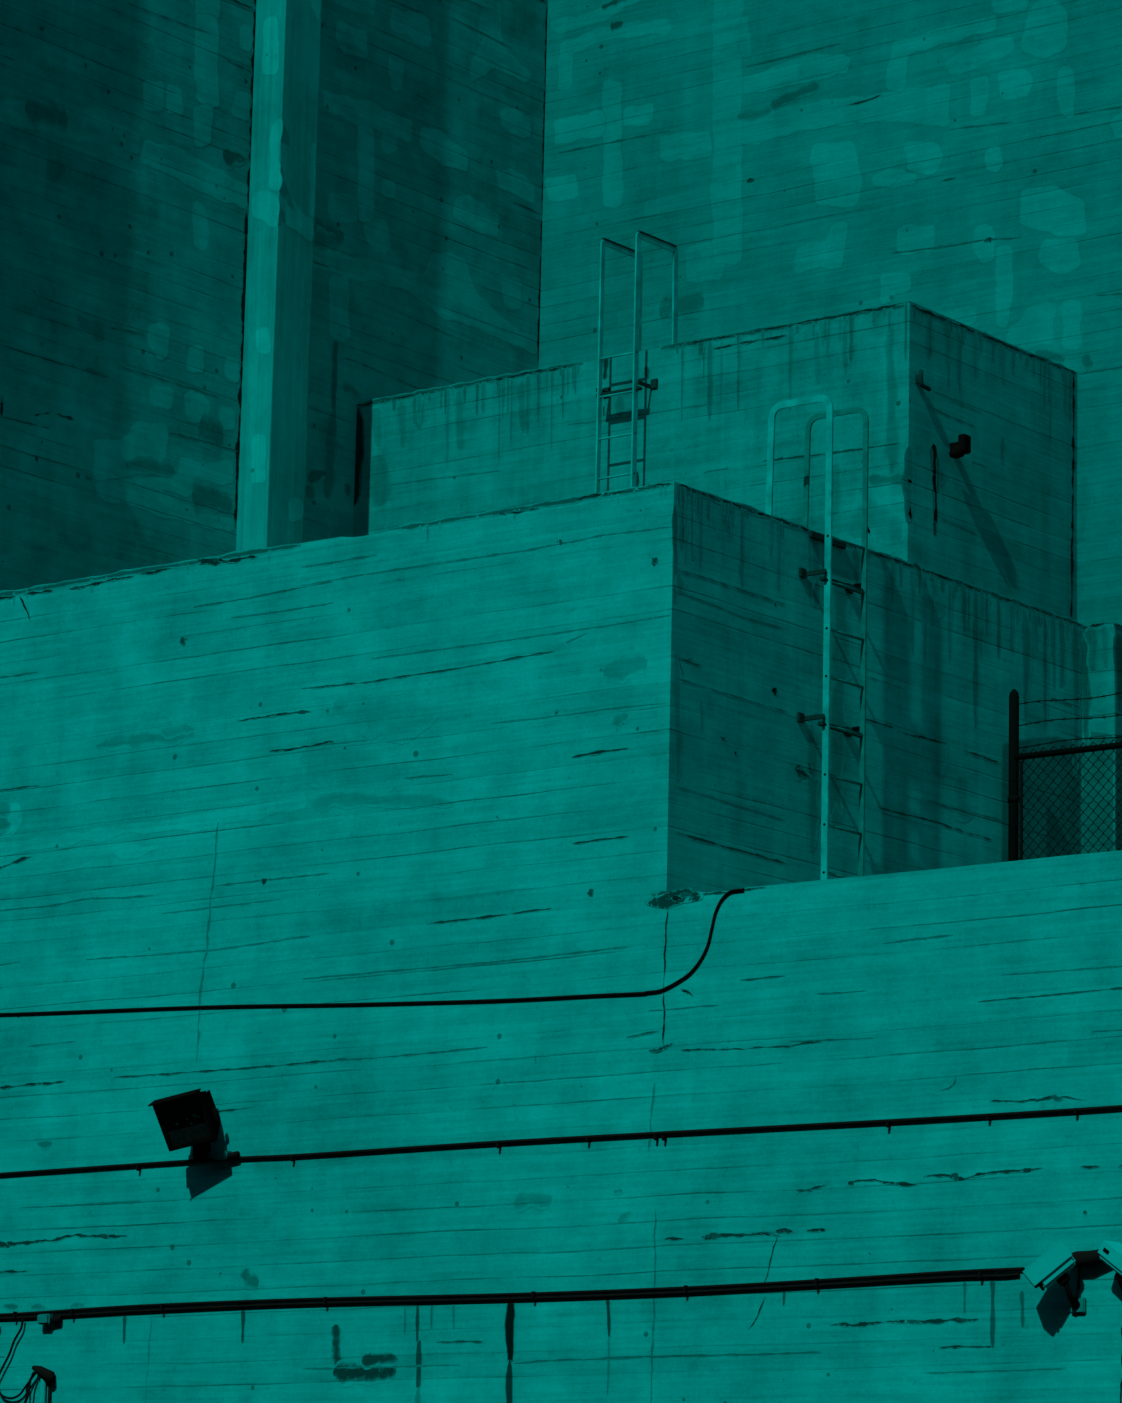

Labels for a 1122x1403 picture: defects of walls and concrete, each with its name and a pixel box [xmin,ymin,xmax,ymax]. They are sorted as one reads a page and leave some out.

damp [305,340,583,507]
damp [390,303,1122,862]
crack [927,1367,1064,1375]
crack [1114,1326,1122,1403]